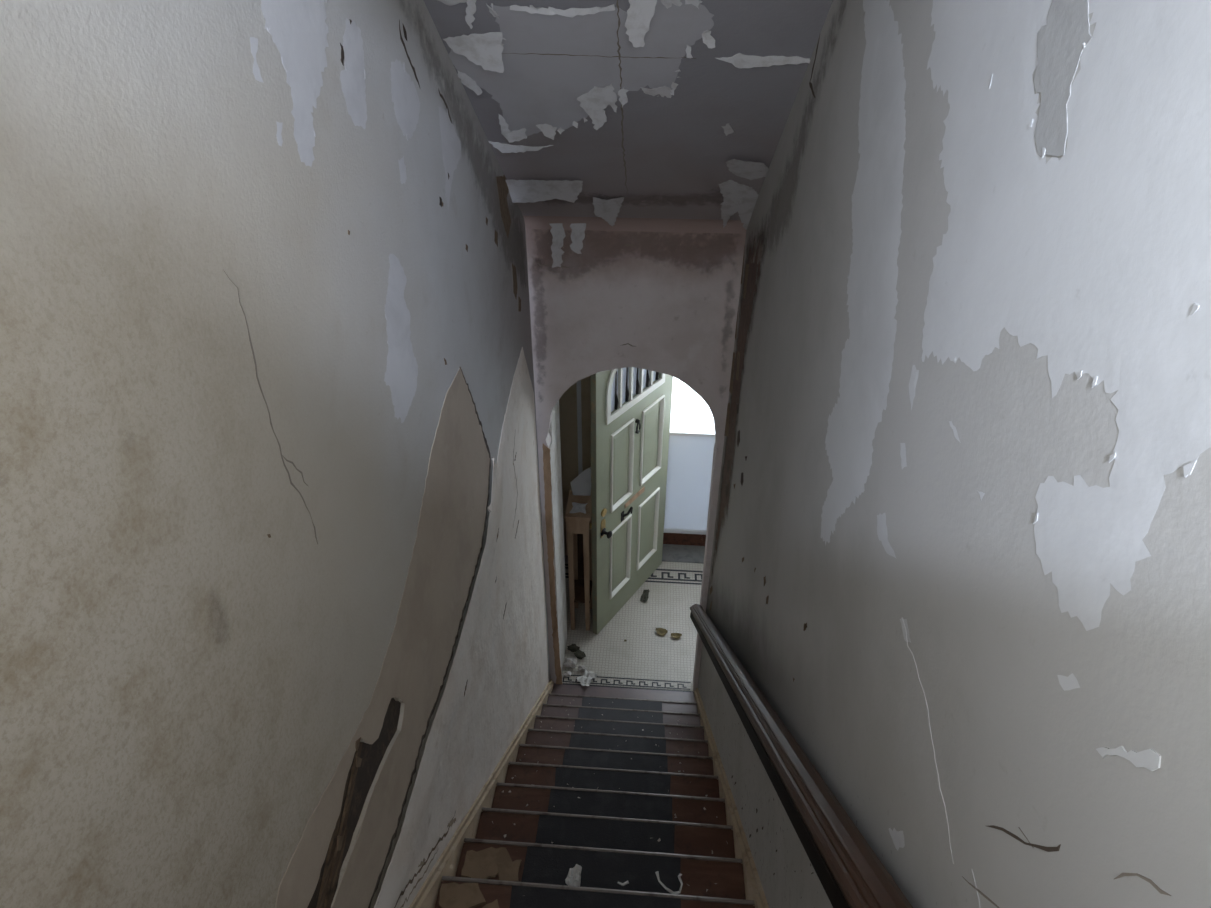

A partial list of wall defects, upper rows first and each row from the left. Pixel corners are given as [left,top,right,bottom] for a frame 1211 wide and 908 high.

peeling [250,0,367,167]
peeling [439,107,462,211]
flaking render [486,175,511,247]
peeling [438,0,714,153]
peeling [716,53,810,68]
peeling [821,0,906,546]
peeling [909,0,1211,631]
crack [223,270,318,544]
flaking render [307,697,401,908]
crack [987,825,1061,852]
crack [1114,872,1171,896]